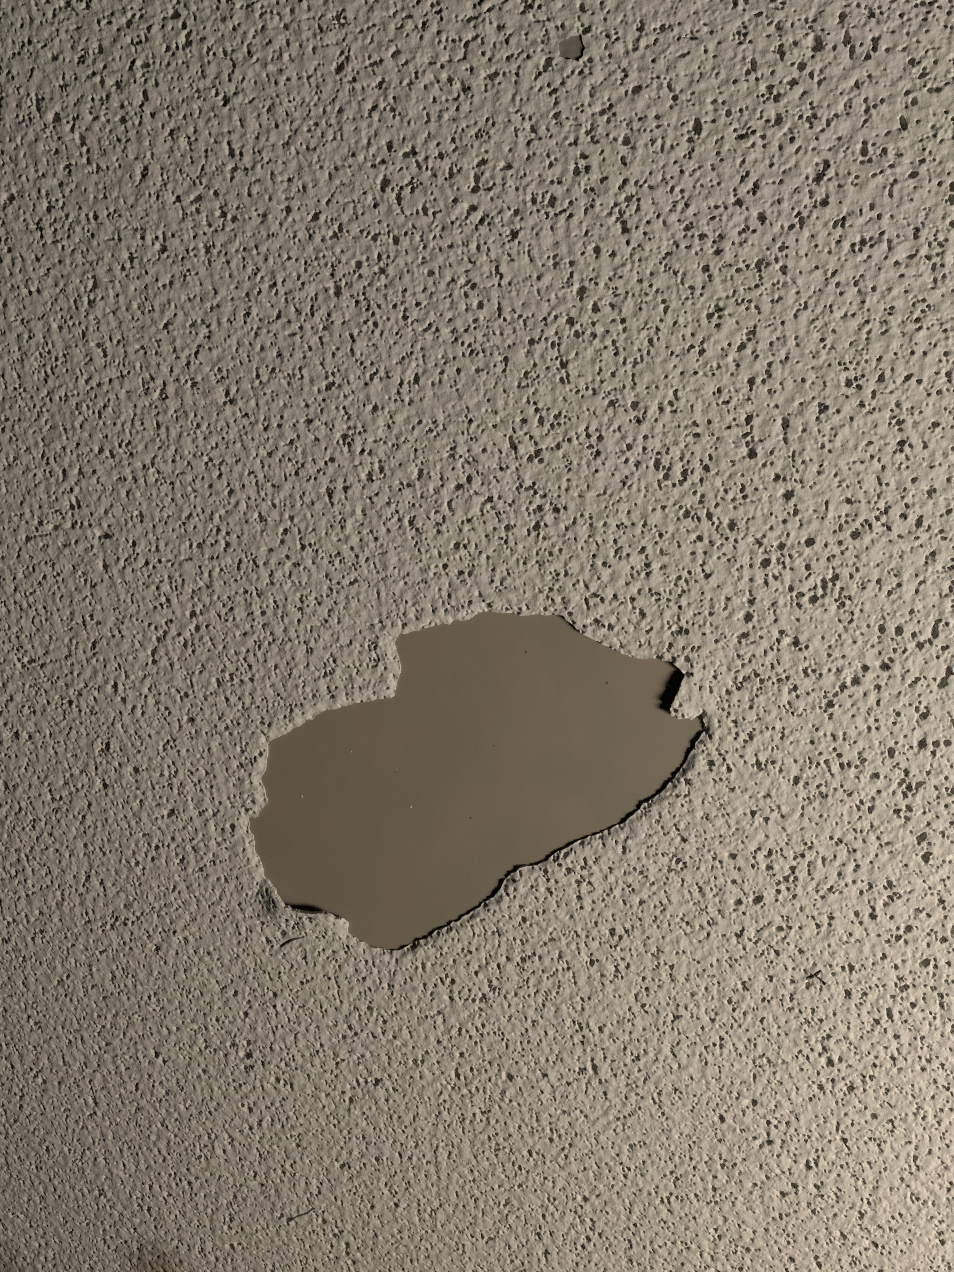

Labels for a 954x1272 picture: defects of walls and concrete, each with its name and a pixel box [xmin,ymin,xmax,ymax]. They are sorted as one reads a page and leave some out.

spalling [558,33,585,61]
peeling [248,610,712,951]